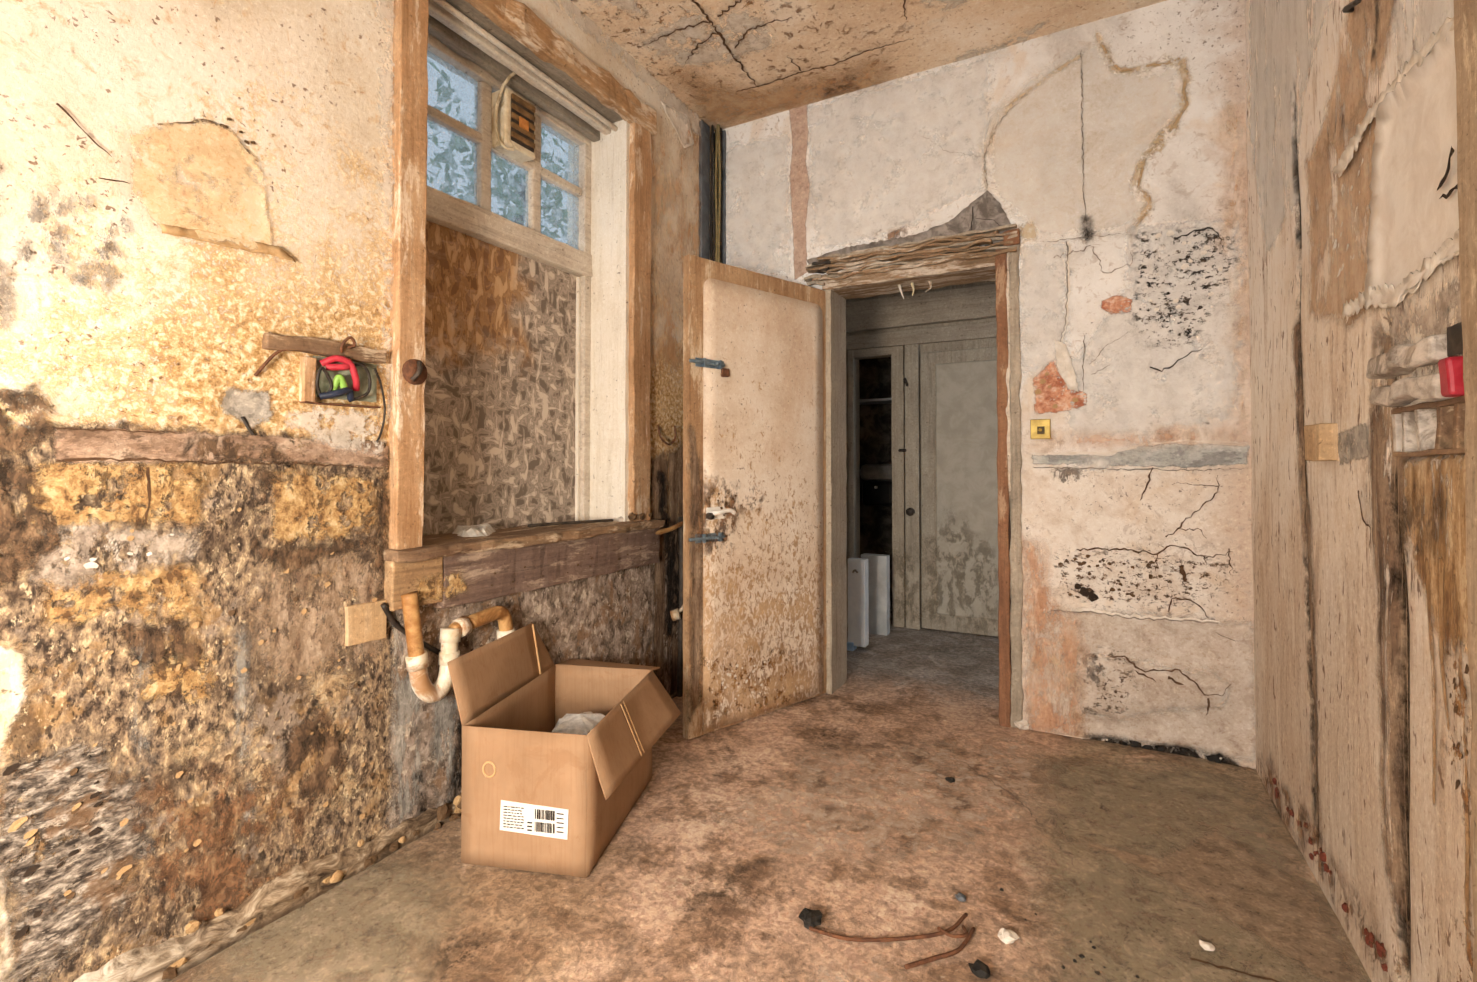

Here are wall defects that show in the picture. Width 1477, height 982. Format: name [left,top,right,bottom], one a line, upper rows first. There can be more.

crack [639,0,914,92]
damp [43,196,128,292]
peeling [806,190,1015,264]
flaking render [1033,339,1087,414]
flaking render [1053,216,1236,372]
damp [1374,323,1395,354]
peeling [22,462,201,588]
peeling [250,467,389,601]
flaking render [1055,553,1234,618]
damp [1366,379,1470,977]
peeling [0,646,156,982]